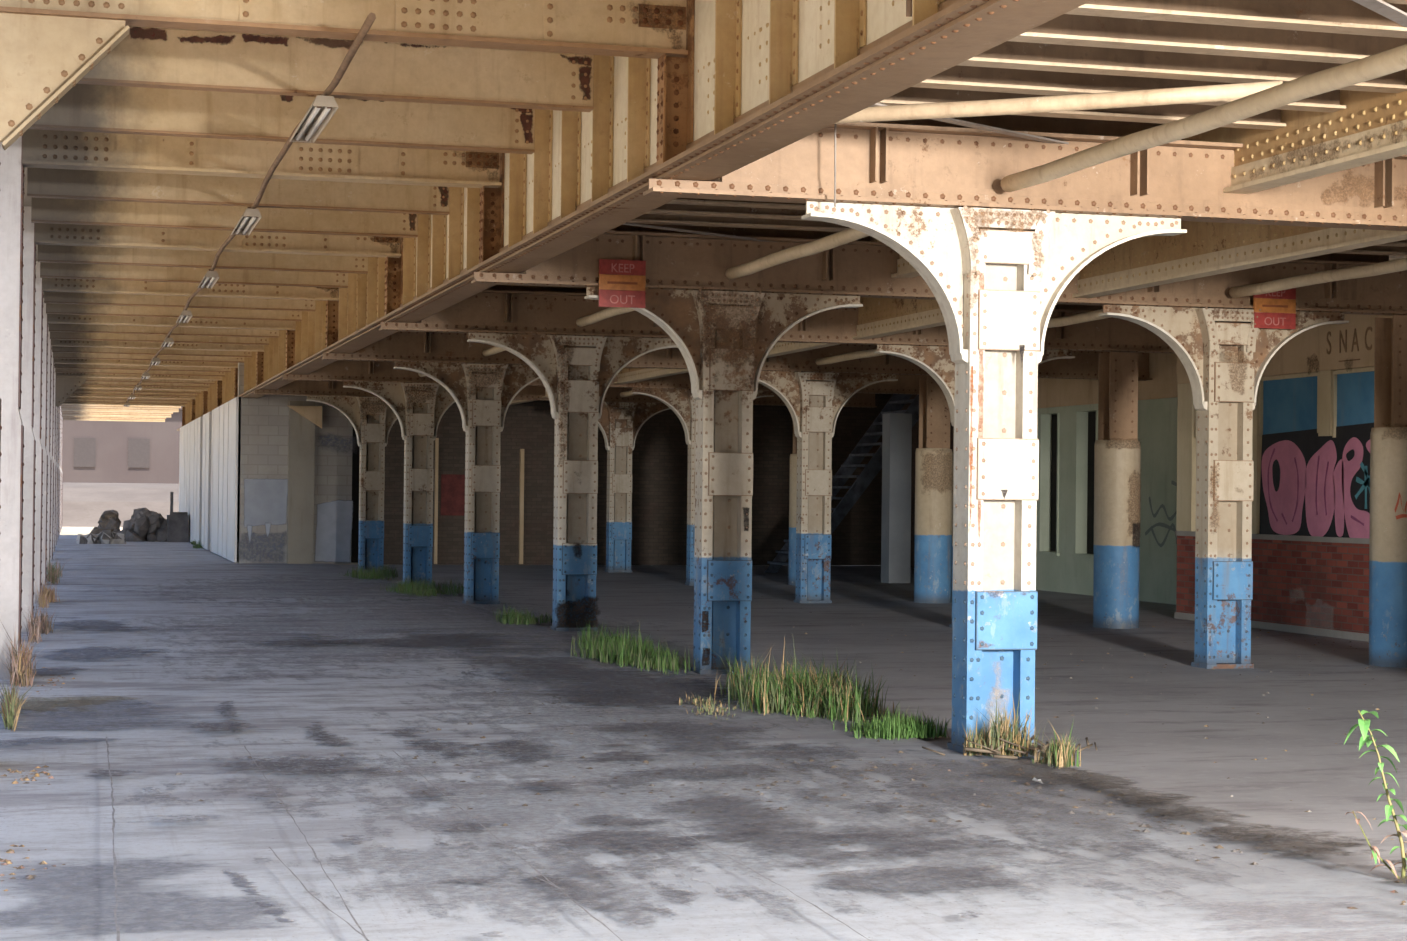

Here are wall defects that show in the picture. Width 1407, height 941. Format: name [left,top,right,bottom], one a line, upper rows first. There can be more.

corrosion [560,54,592,100]
corrosion [962,206,1047,308]
corrosion [969,350,984,536]
water stain [575,814,664,826]
water stain [807,827,1026,891]